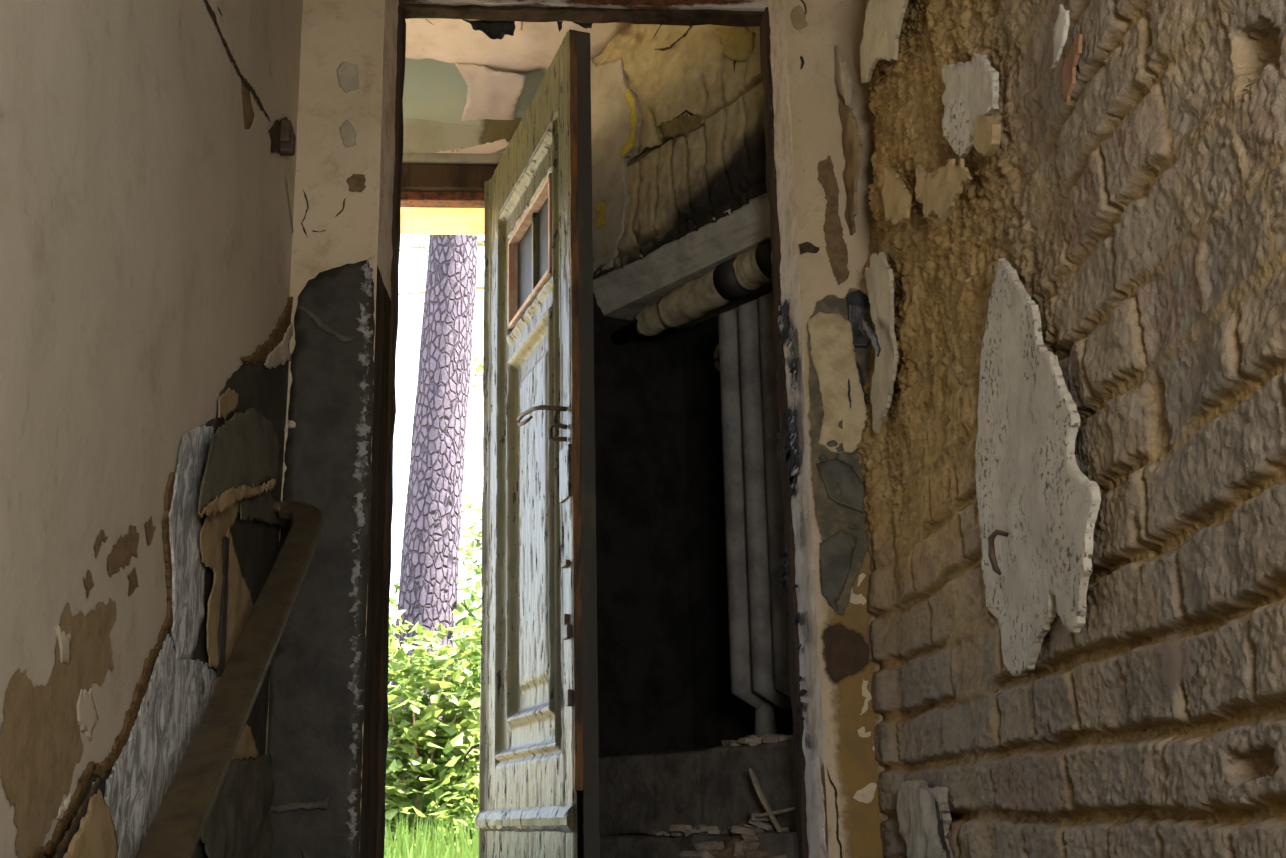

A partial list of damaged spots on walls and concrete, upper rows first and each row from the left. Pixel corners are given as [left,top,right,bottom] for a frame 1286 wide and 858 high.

crack [204,0,271,130]
peeling [436,139,509,154]
peeling [405,18,631,121]
crack [630,110,694,161]
crack [651,25,692,51]
spalling [658,114,705,139]
spalling [715,6,807,187]
flaking render [882,54,1001,225]
spalling [1051,4,1083,106]
peeling [776,0,909,854]
flaking render [968,258,1101,677]
peeling [0,256,375,858]